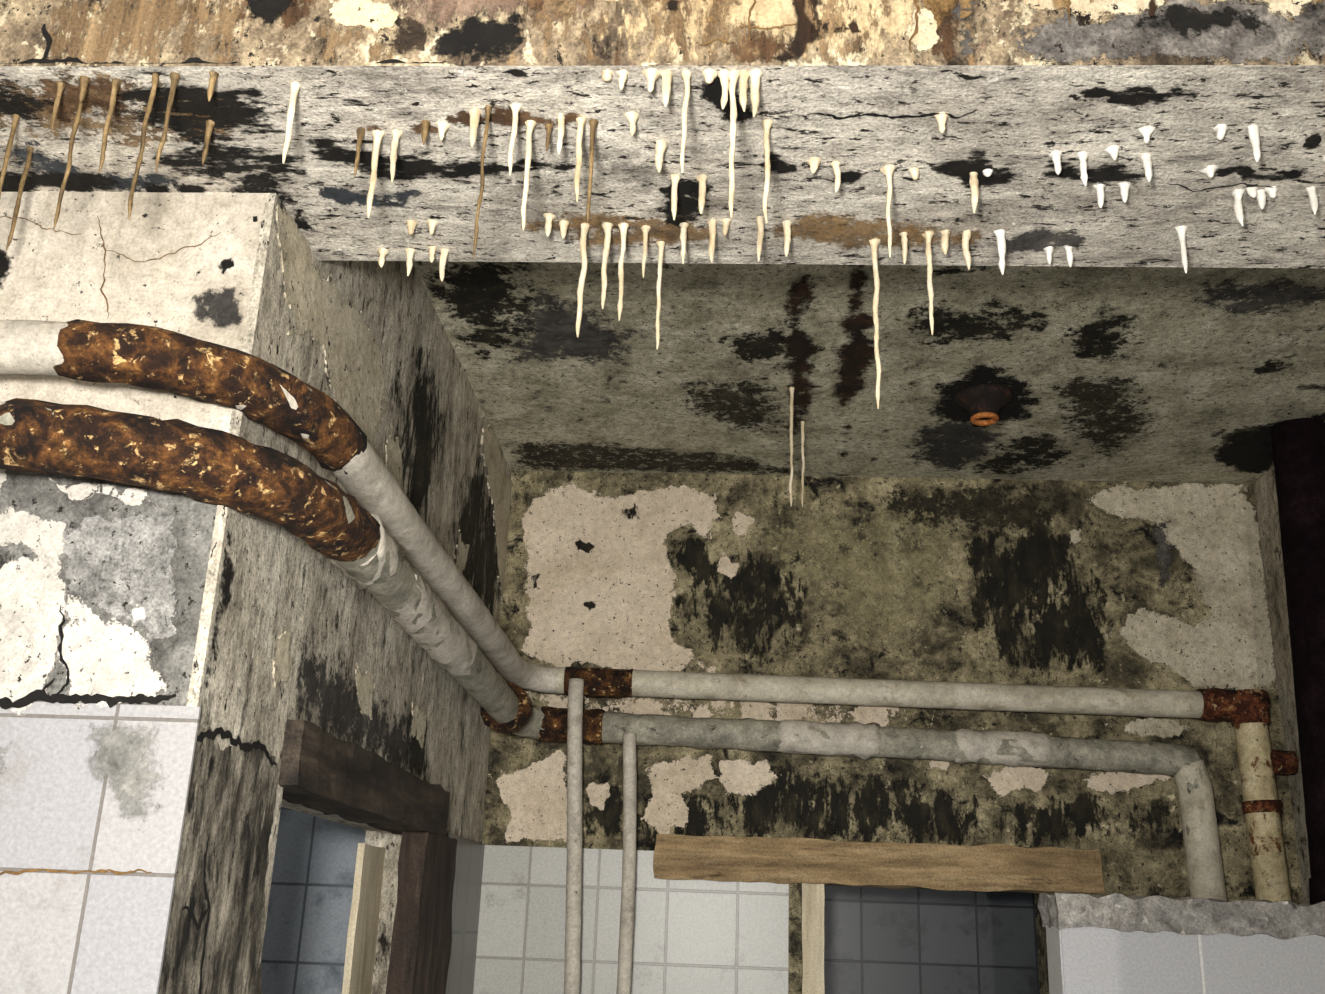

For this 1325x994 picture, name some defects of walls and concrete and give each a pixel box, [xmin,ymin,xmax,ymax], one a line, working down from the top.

leakage [0,0,576,232]
flaking render [239,0,529,77]
leakage [930,150,1021,188]
crack [1062,0,1071,23]
leakage [512,265,875,475]
crack [0,606,176,710]
peeling [0,477,180,716]
crack [196,727,276,766]
peeling [481,411,755,673]
peeling [524,690,915,834]
leakage [668,314,1158,676]
peeling [1088,420,1285,690]